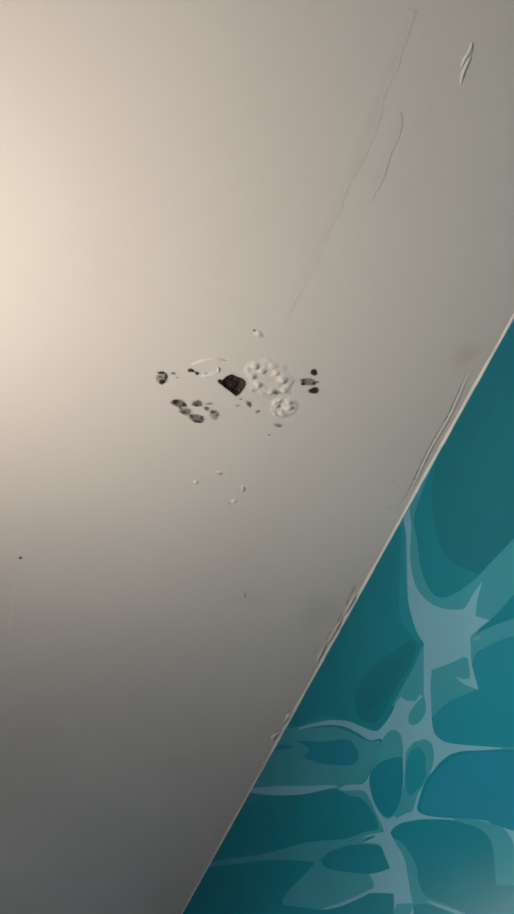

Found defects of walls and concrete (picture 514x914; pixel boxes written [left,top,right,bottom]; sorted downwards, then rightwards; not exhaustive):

spalling [191,357,246,396]
leakage [301,369,318,394]
leakage [171,400,218,423]